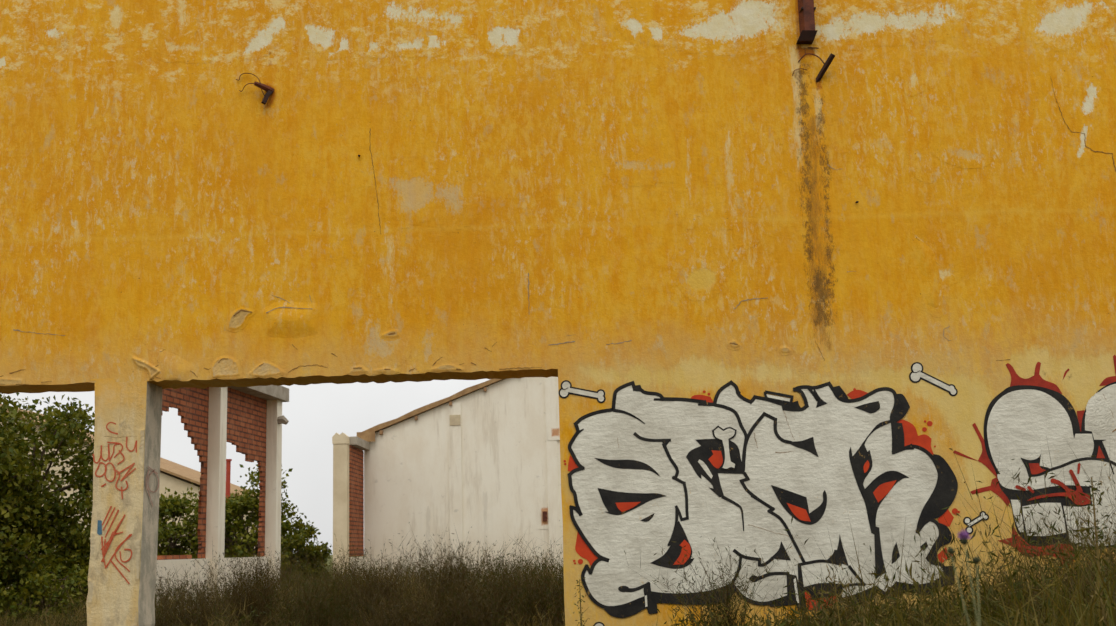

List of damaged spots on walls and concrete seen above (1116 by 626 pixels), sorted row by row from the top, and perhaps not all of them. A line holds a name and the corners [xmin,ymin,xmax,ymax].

peeling [236,0,526,60]
peeling [613,0,797,56]
peeling [812,0,978,55]
peeling [1021,0,1116,61]
crack [1051,79,1116,171]
leakage [777,39,835,325]
spalling [225,305,256,332]
spalling [209,354,288,379]
peeling [347,303,466,374]